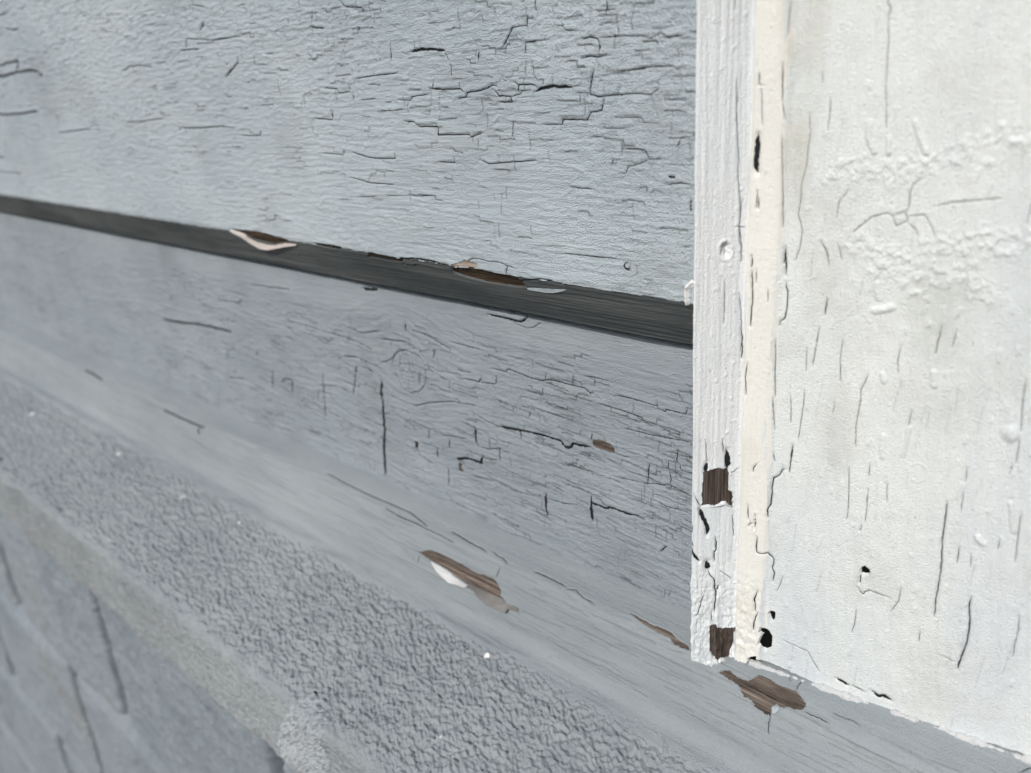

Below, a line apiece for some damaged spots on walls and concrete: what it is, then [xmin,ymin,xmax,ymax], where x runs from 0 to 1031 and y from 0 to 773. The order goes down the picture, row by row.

crack [181,5,238,51]
crack [0,59,44,78]
crack [316,0,685,174]
peeling [230,228,296,250]
peeling [452,260,566,293]
crack [164,66,999,638]
peeling [701,468,733,508]
peeling [418,550,519,613]
peeling [631,614,689,650]
crack [944,597,972,669]
peeling [709,624,806,716]
crack [786,641,891,725]